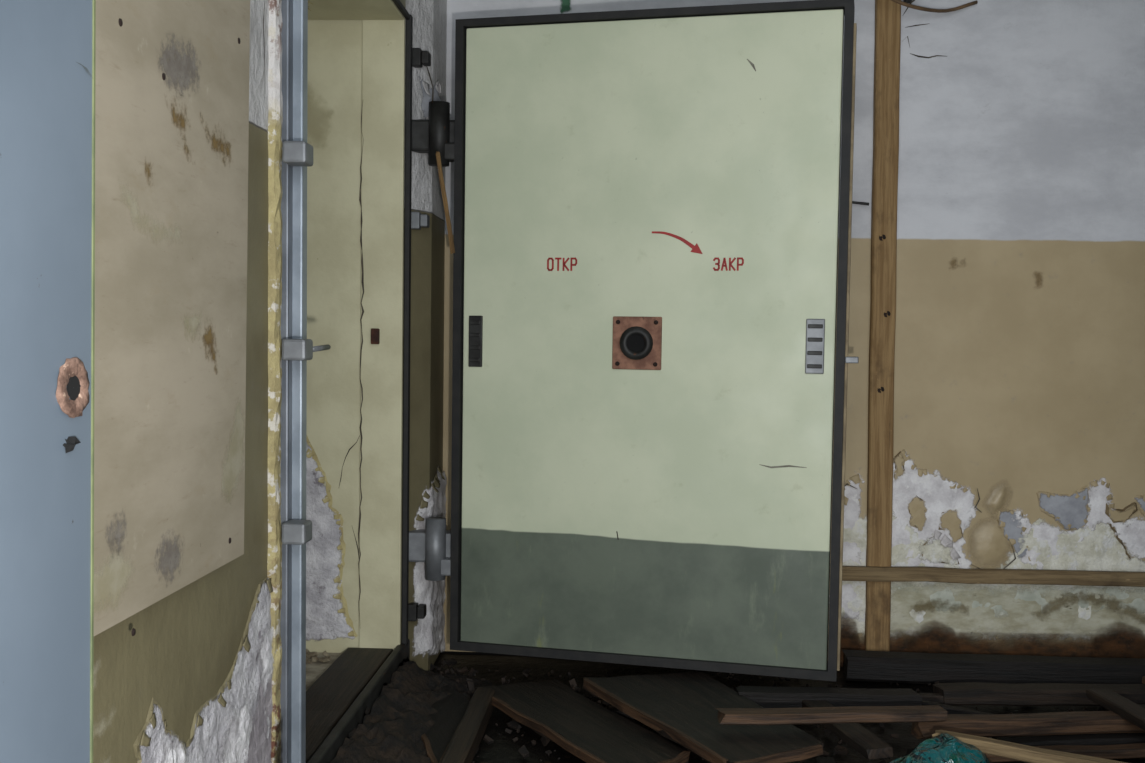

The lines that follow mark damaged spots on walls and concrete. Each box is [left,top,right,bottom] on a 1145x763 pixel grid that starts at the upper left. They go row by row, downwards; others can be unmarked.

peeling [306,434,358,641]
peeling [843,474,864,565]
water stain [843,517,867,566]
water stain [891,510,928,567]
peeling [891,450,977,569]
peeling [996,478,1145,570]
water stain [1000,518,1145,572]
peeling [842,584,860,619]
water stain [841,581,866,636]
water stain [890,582,1145,640]
peeling [133,577,274,763]